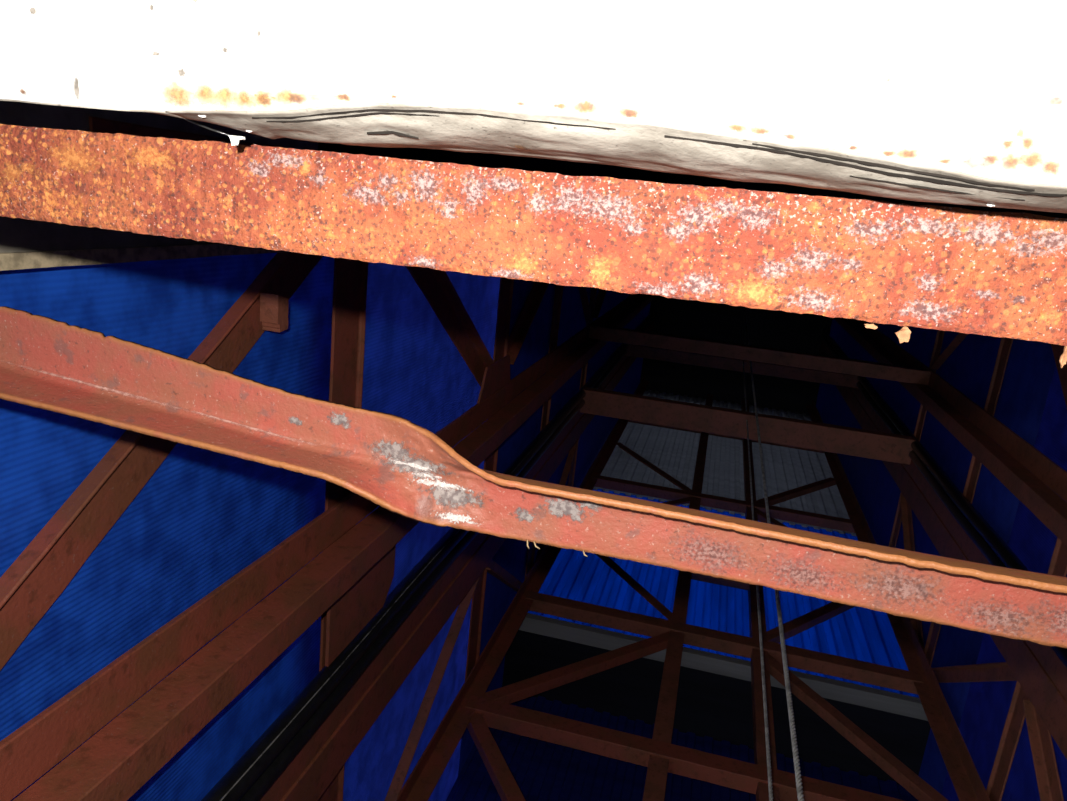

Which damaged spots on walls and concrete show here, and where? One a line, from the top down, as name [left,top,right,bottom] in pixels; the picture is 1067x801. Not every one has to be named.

rust [169,68,349,108]
rust [554,99,637,117]
rust [50,146,100,172]
rust [127,146,174,169]
rust [882,148,950,163]
rust [963,128,1067,178]
rust [0,163,39,181]
rust [586,260,611,285]
rust [725,280,781,305]
rust [895,326,911,343]
peeling [369,440,483,524]
peeling [515,498,601,523]